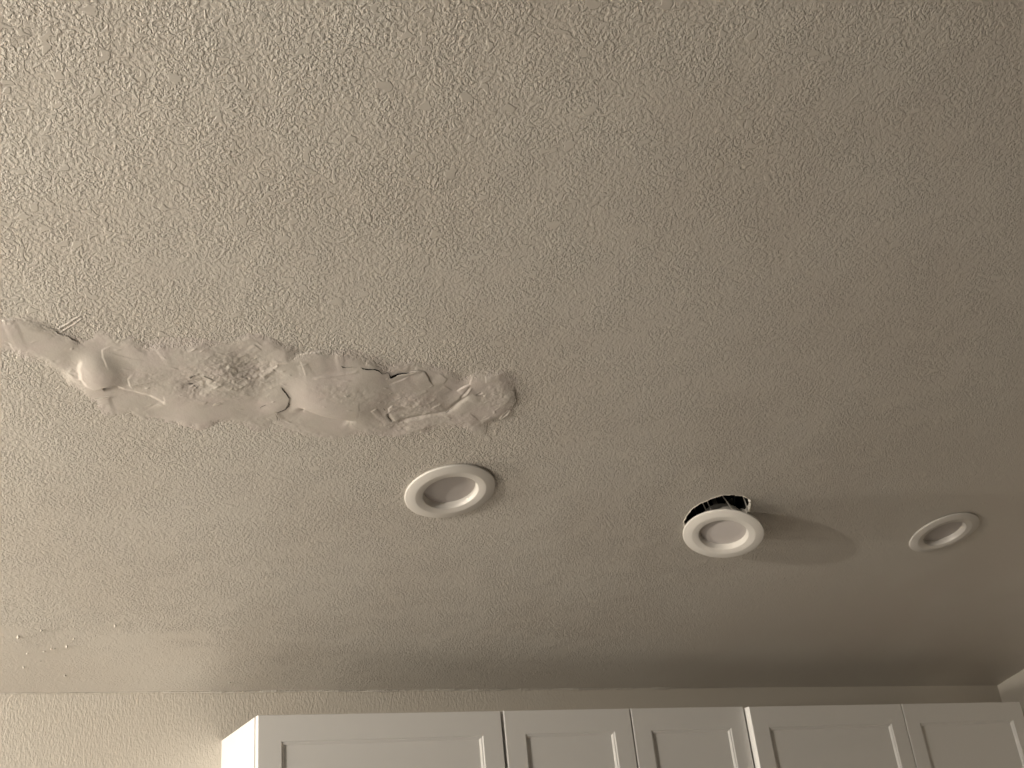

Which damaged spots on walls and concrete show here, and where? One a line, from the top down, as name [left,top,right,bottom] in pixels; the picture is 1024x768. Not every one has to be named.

peeling [0,315,518,440]
crack [341,366,416,379]
spalling [683,494,751,527]